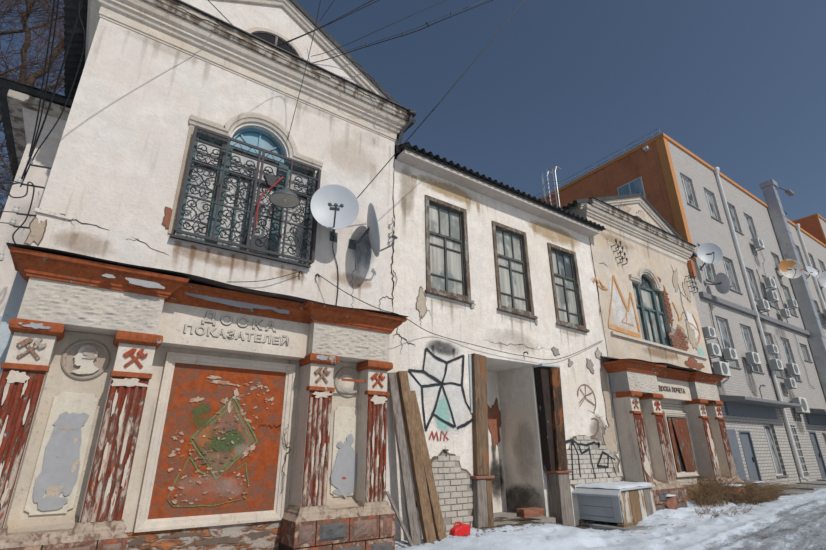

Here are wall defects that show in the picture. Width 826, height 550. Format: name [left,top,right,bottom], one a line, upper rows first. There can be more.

peeling [101,274,165,289]
crack [379,158,414,352]
peeling [1,370,30,425]
peeling [91,378,149,515]
peeling [168,375,274,506]
peeling [311,413,331,496]
peeling [331,434,357,498]
peeling [370,395,387,405]
peeling [371,423,386,488]
spalling [430,449,473,534]
spalling [566,347,624,489]
peeling [707,423,719,468]